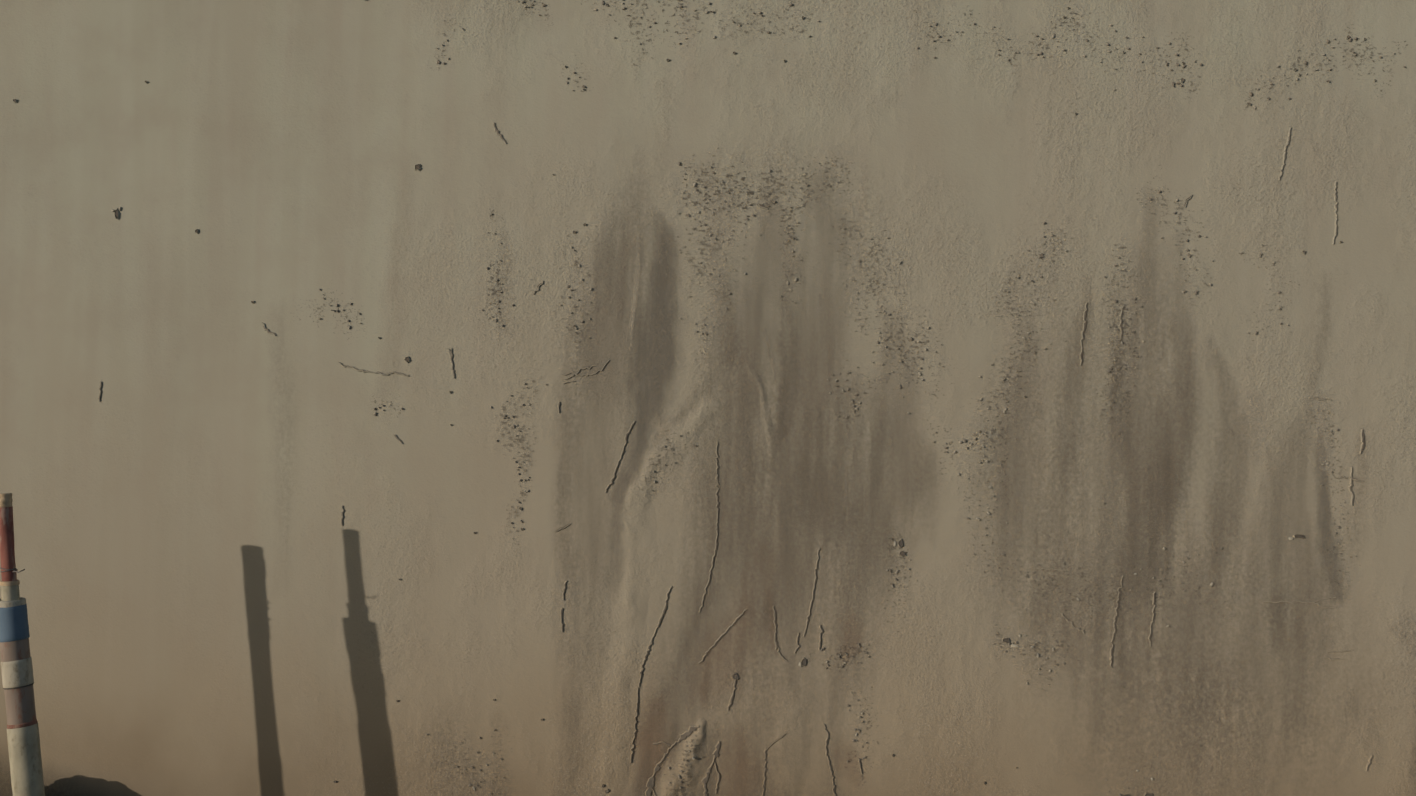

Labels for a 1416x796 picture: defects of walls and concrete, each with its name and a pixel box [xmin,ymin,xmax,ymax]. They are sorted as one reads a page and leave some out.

crack [630,442,823,796]